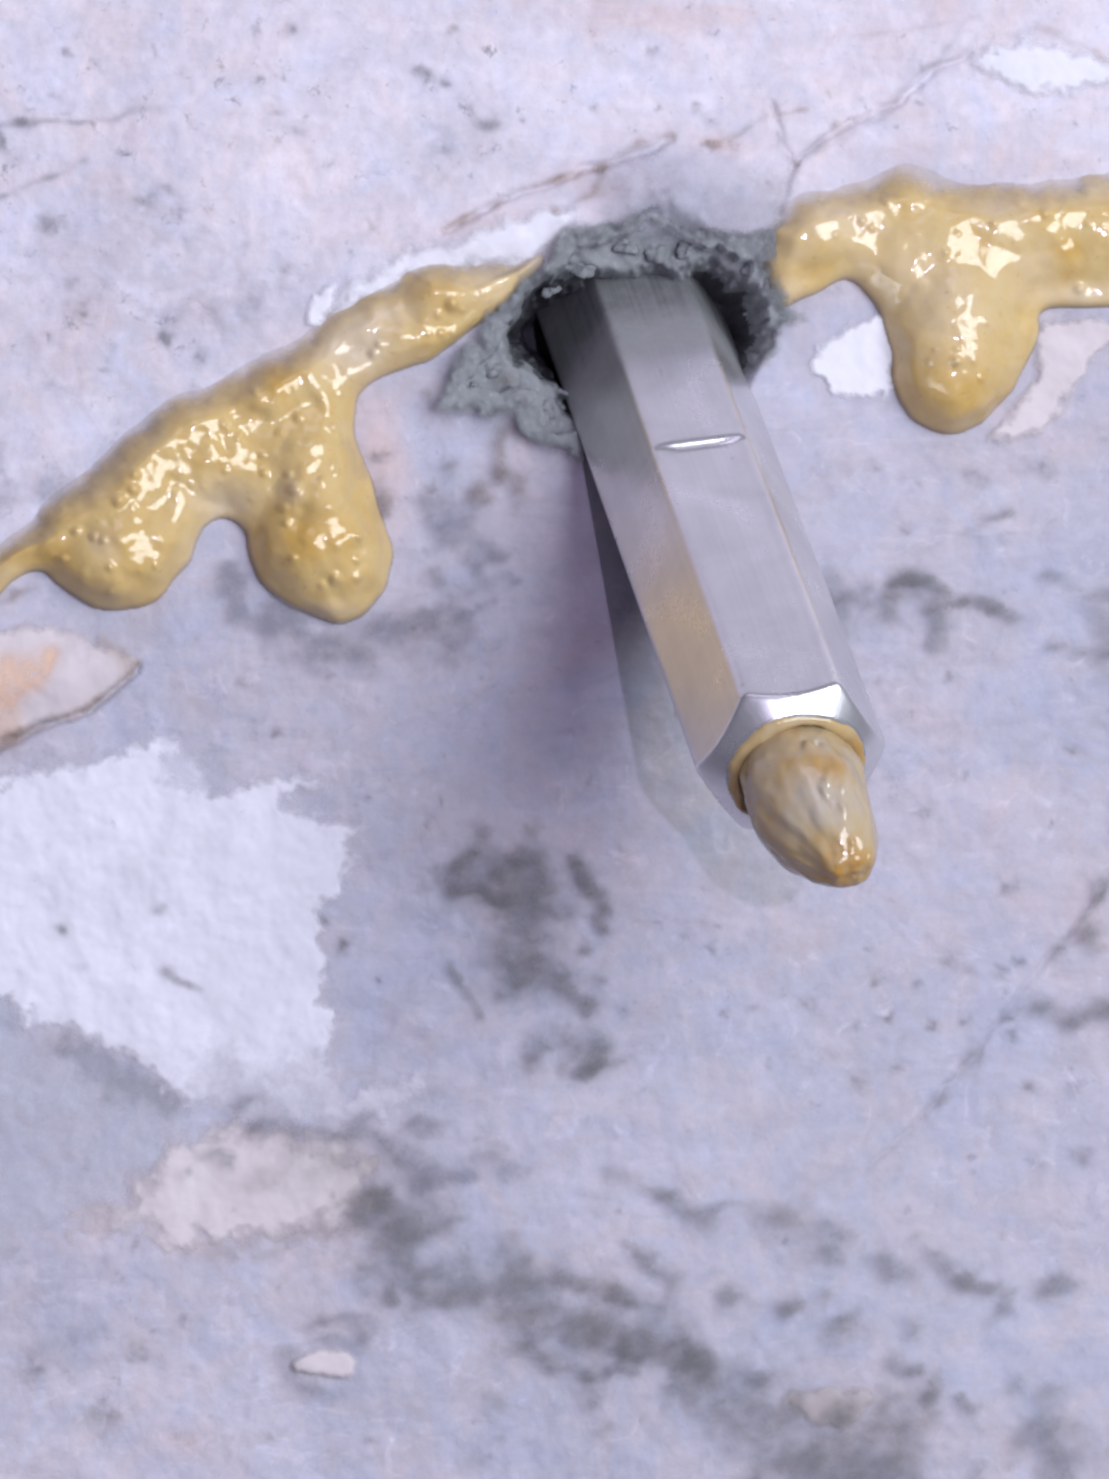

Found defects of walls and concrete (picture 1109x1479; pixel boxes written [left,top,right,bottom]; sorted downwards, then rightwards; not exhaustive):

spalling [308,191,804,461]
peeling [811,316,893,397]
peeling [990,319,1109,441]
peeling [0,737,425,1252]